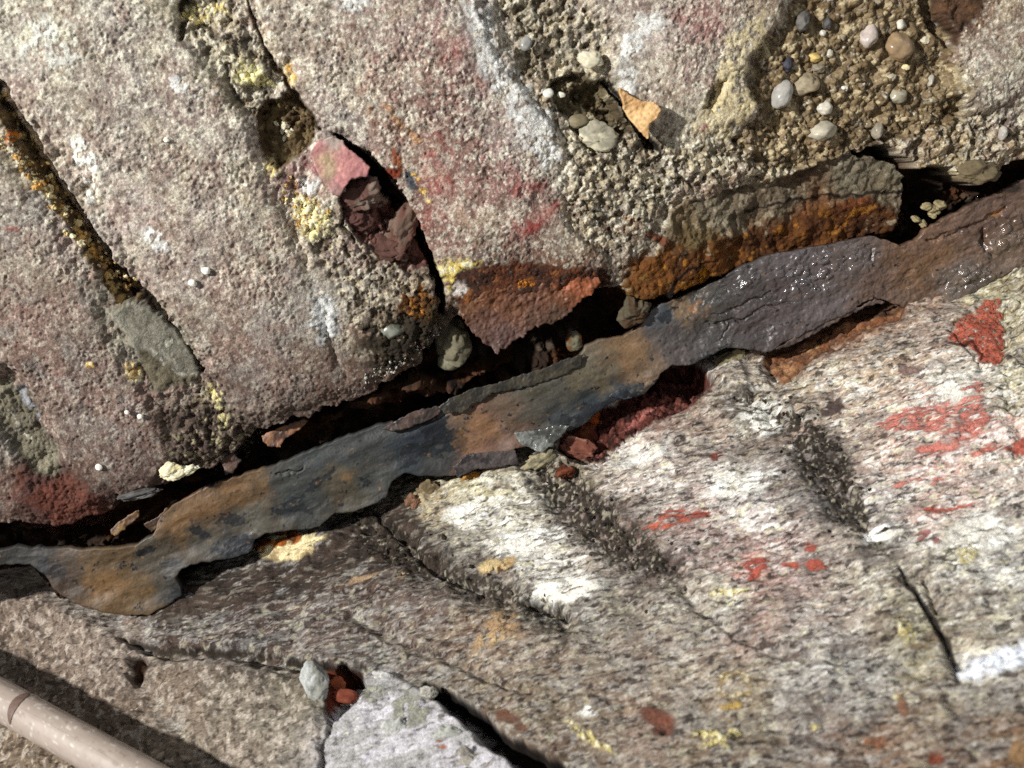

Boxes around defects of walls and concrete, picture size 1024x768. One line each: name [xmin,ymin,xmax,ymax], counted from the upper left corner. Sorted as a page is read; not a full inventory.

spalling [257,93,427,272]
corrosion [400,286,441,321]
corrosion [445,195,900,354]
corrosion [764,299,904,385]
corrosion [383,355,583,432]
corrosion [220,453,242,475]
corrosion [261,419,308,447]
corrosion [453,450,519,478]
corrosion [110,499,177,536]
crack [896,565,960,680]